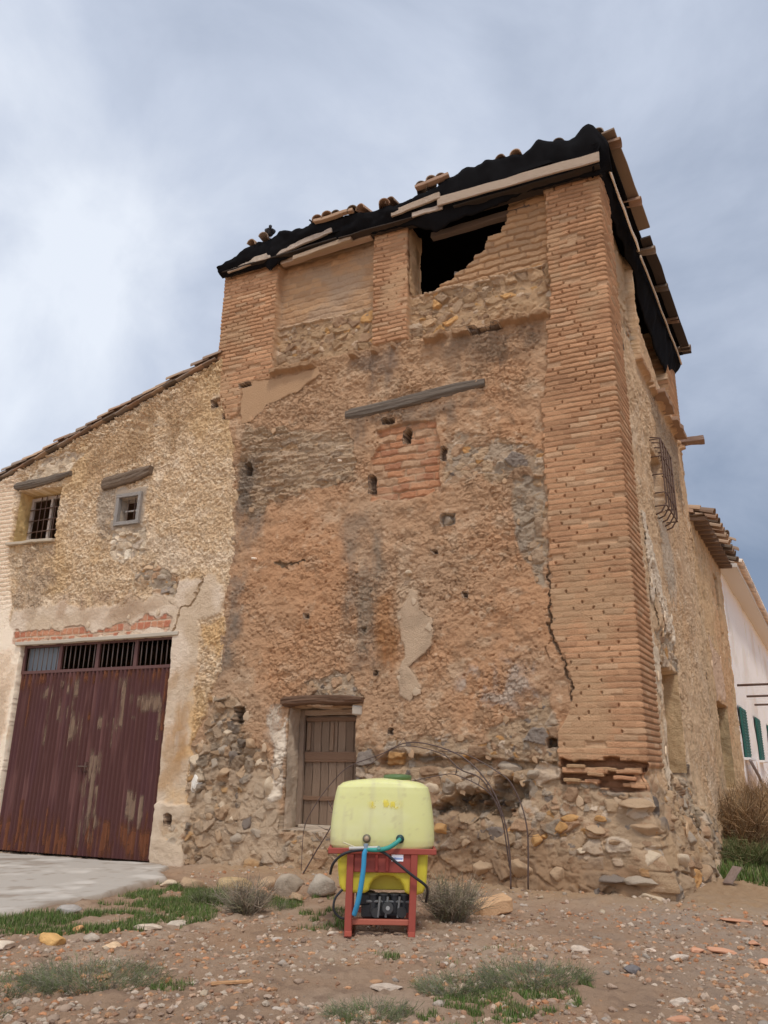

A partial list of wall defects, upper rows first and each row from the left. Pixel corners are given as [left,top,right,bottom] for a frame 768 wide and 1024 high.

peeling [12,609,172,644]
peeling [396,588,434,701]
crack [546,565,575,702]
rust [0,800,150,860]
rust [68,667,168,731]
flaking render [182,694,284,868]
flaking render [381,693,649,792]